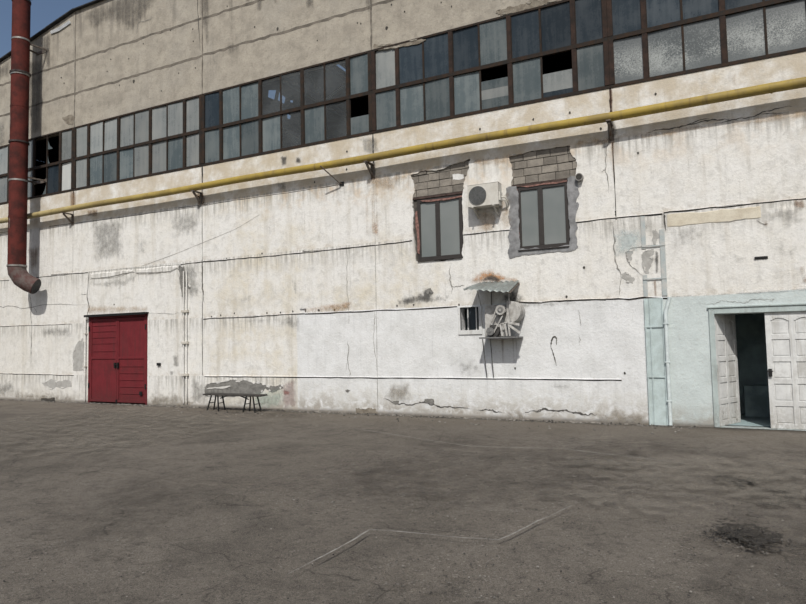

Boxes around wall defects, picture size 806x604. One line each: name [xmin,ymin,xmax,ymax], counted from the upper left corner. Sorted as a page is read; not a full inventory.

crack [652,106,792,132]
peeling [622,229,660,284]
corrosion [475,273,505,281]
flaking render [205,380,284,397]
crack [387,399,499,413]
crack [525,408,593,416]